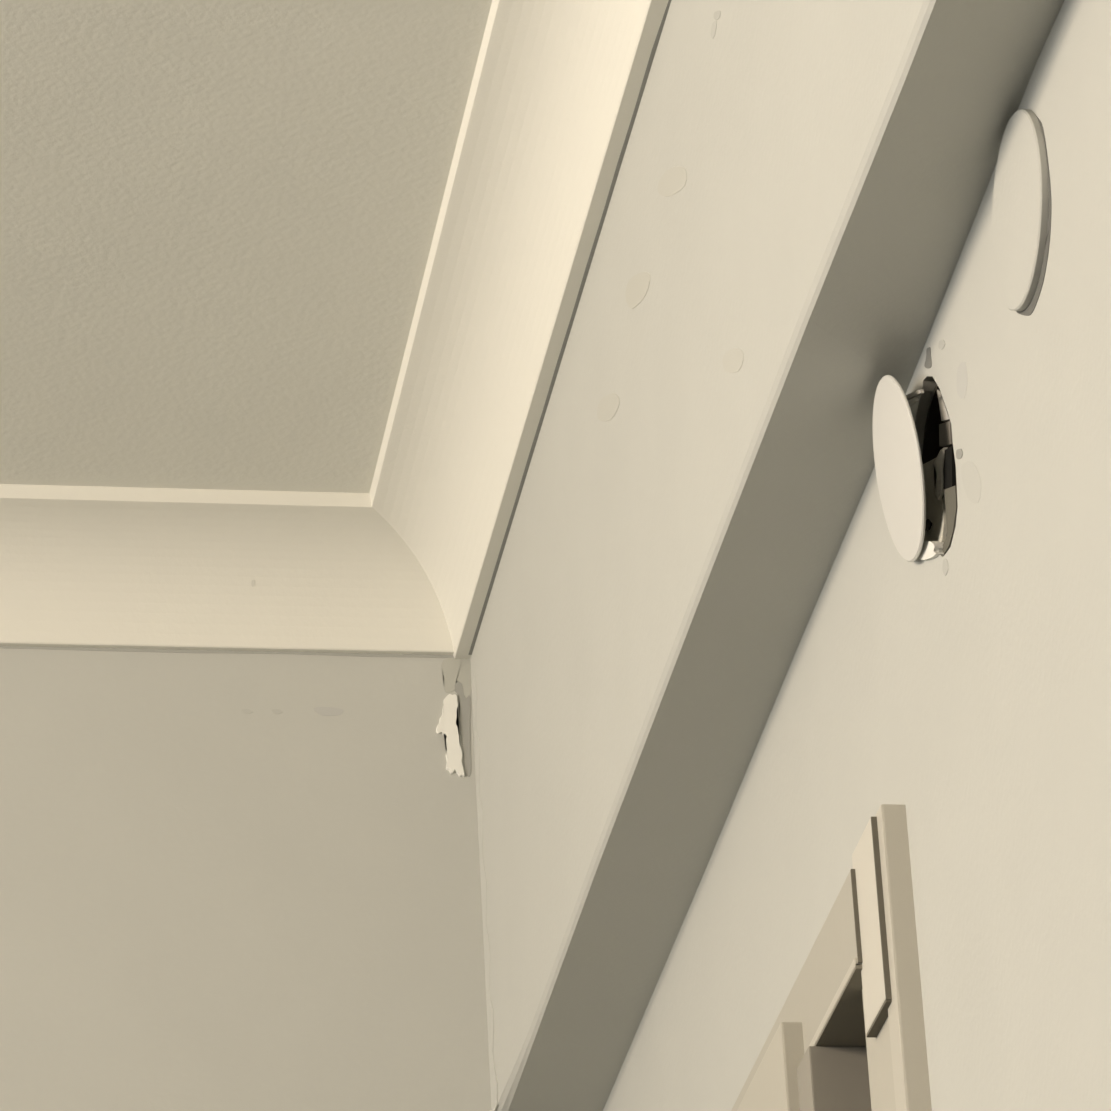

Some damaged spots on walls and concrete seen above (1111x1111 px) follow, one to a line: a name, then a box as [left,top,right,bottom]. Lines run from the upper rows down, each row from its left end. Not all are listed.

spalling [436,694,464,777]